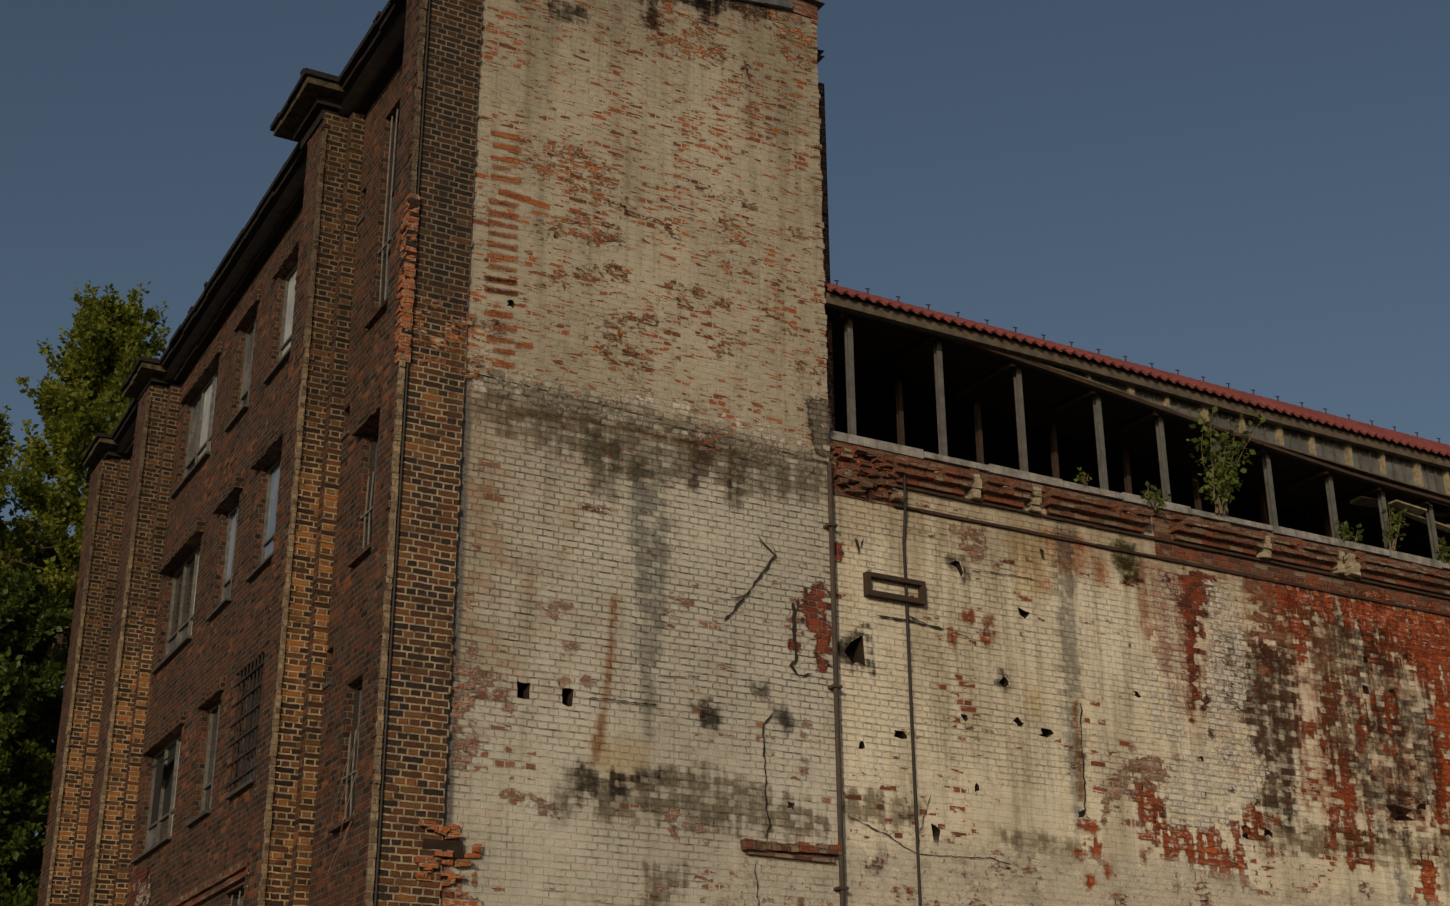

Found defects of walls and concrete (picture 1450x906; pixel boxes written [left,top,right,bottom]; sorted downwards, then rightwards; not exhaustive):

peeling [645,0,755,90]
spalling [393,131,732,400]
peeling [673,185,759,277]
crack [724,537,777,621]
crack [789,602,813,677]
spalling [787,581,876,679]
peeling [1158,568,1219,739]
peeling [1242,572,1450,906]
peeling [133,874,152,906]
spalling [415,819,484,906]
crack [754,711,774,906]
peeling [1074,745,1281,906]